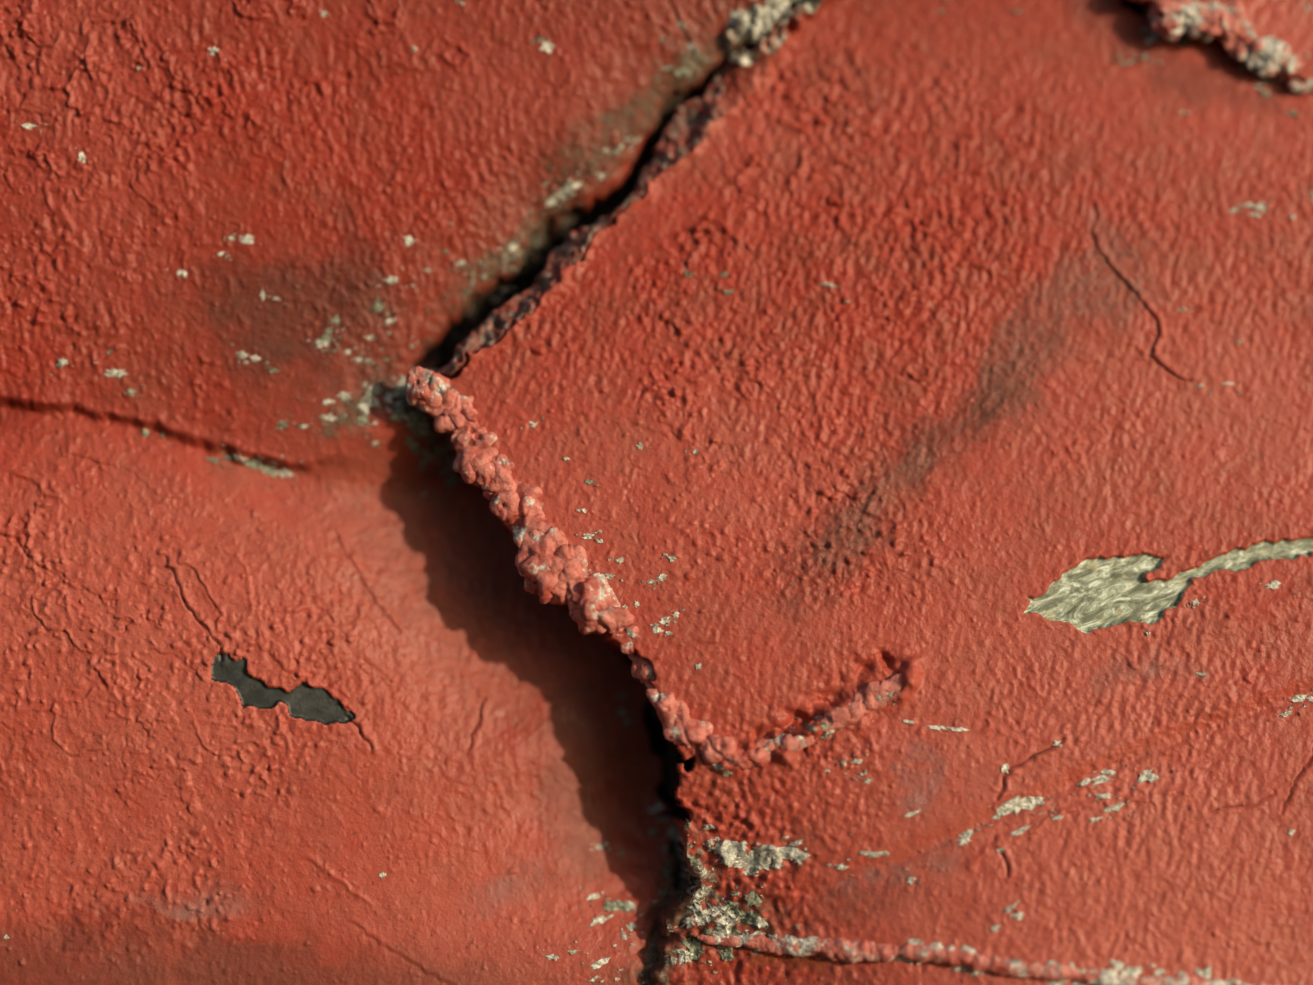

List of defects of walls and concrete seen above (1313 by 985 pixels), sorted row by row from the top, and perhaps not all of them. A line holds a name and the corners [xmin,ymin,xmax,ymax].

crack [1121,0,1150,19]
crack [415,0,822,379]
crack [1090,204,1185,382]
peeling [1023,538,1313,635]
peeling [211,654,356,725]
crack [470,706,481,746]
crack [617,651,713,911]
crack [1000,745,1054,792]
crack [1212,757,1312,813]